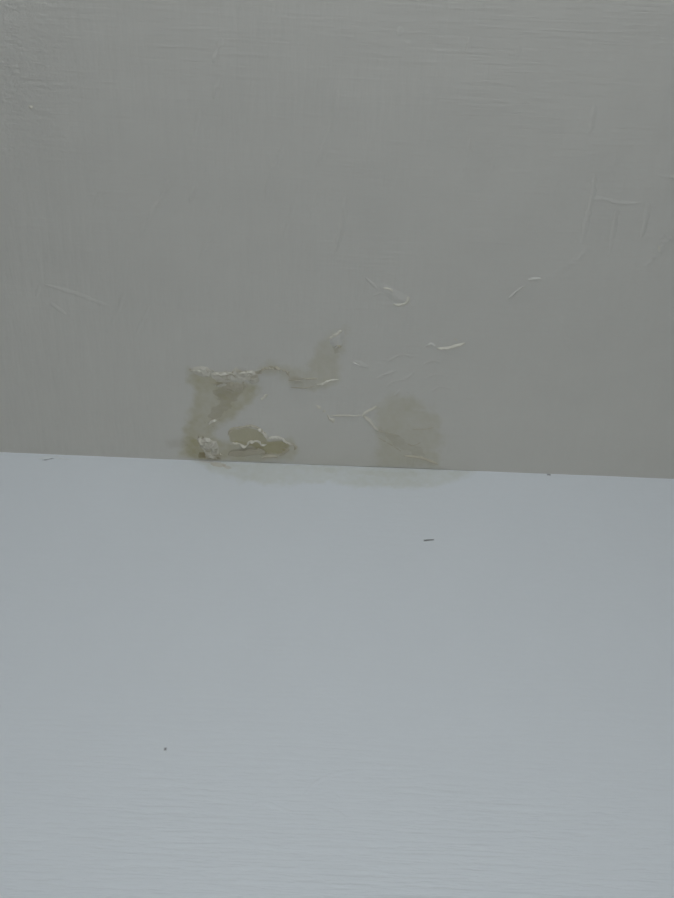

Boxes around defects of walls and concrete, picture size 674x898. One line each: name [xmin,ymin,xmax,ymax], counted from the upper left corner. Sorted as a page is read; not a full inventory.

peeling [197,424,298,459]
damp [163,323,478,492]